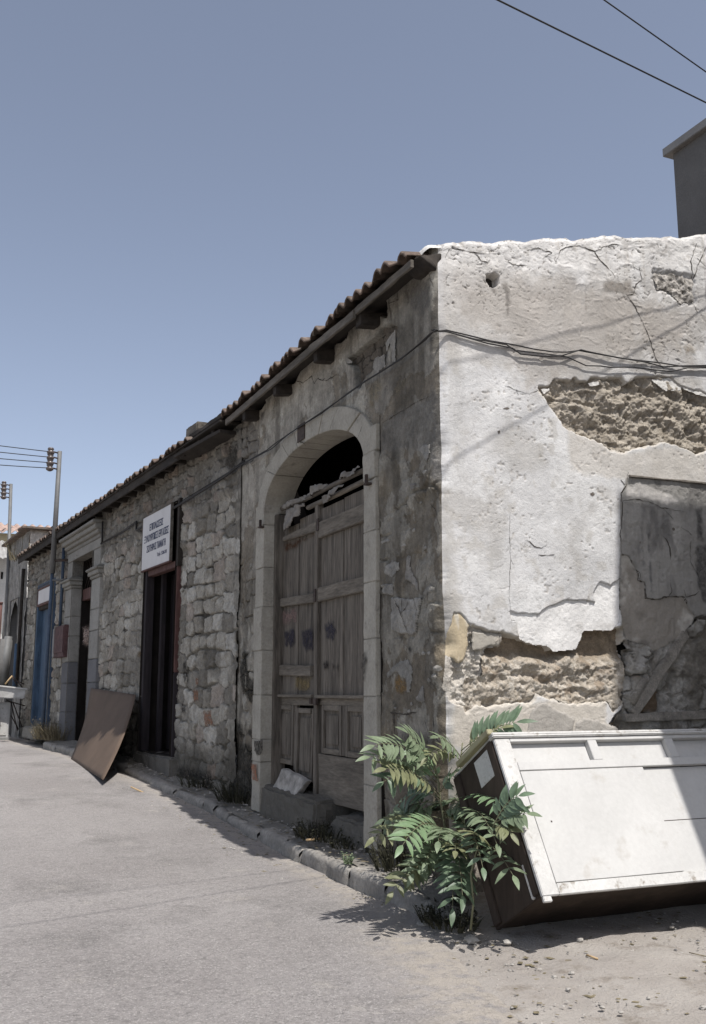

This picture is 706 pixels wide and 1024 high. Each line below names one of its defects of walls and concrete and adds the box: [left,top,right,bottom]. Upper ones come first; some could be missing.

crack [442,244,664,369]
spalling [652,273,694,304]
crack [690,243,706,311]
spalling [538,376,706,454]
crack [620,472,702,604]
spalling [441,555,706,730]